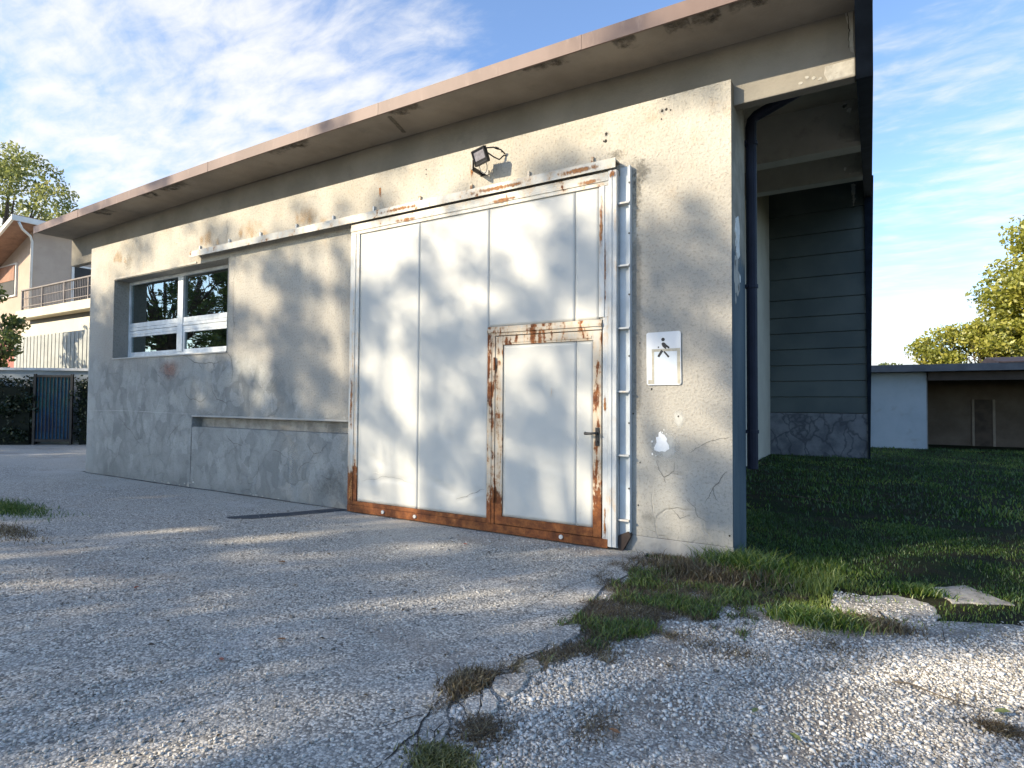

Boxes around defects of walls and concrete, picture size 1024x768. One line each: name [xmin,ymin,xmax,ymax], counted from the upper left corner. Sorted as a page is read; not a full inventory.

corrosion [563,165,597,184]
corrosion [471,182,521,203]
peeling [651,429,675,456]
crack [638,472,733,548]